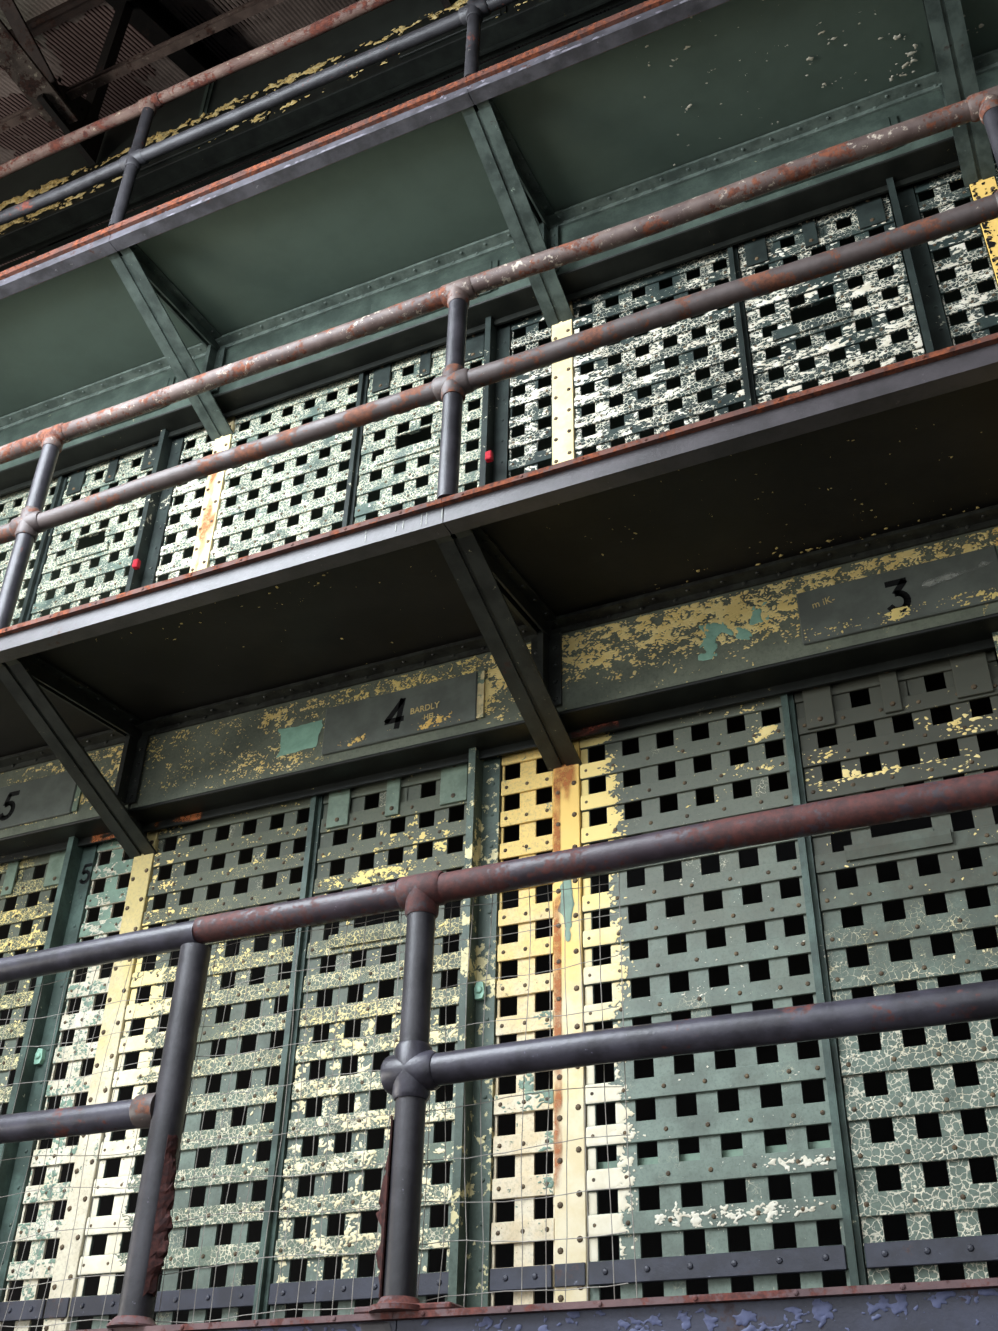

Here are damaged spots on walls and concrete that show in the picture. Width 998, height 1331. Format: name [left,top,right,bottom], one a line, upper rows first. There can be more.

peeling [573,254,924,455]
peeling [156,479,207,580]
corrosion [180,812,201,821]
corrosion [553,764,574,852]
peeling [580,732,638,846]
peeling [111,953,177,1102]
peeling [582,873,638,1032]
peeling [75,1129,147,1297]
corrosion [143,1135,179,1297]
corrosion [375,1115,394,1299]
corrosion [554,1090,562,1176]
peeling [585,1062,646,1262]